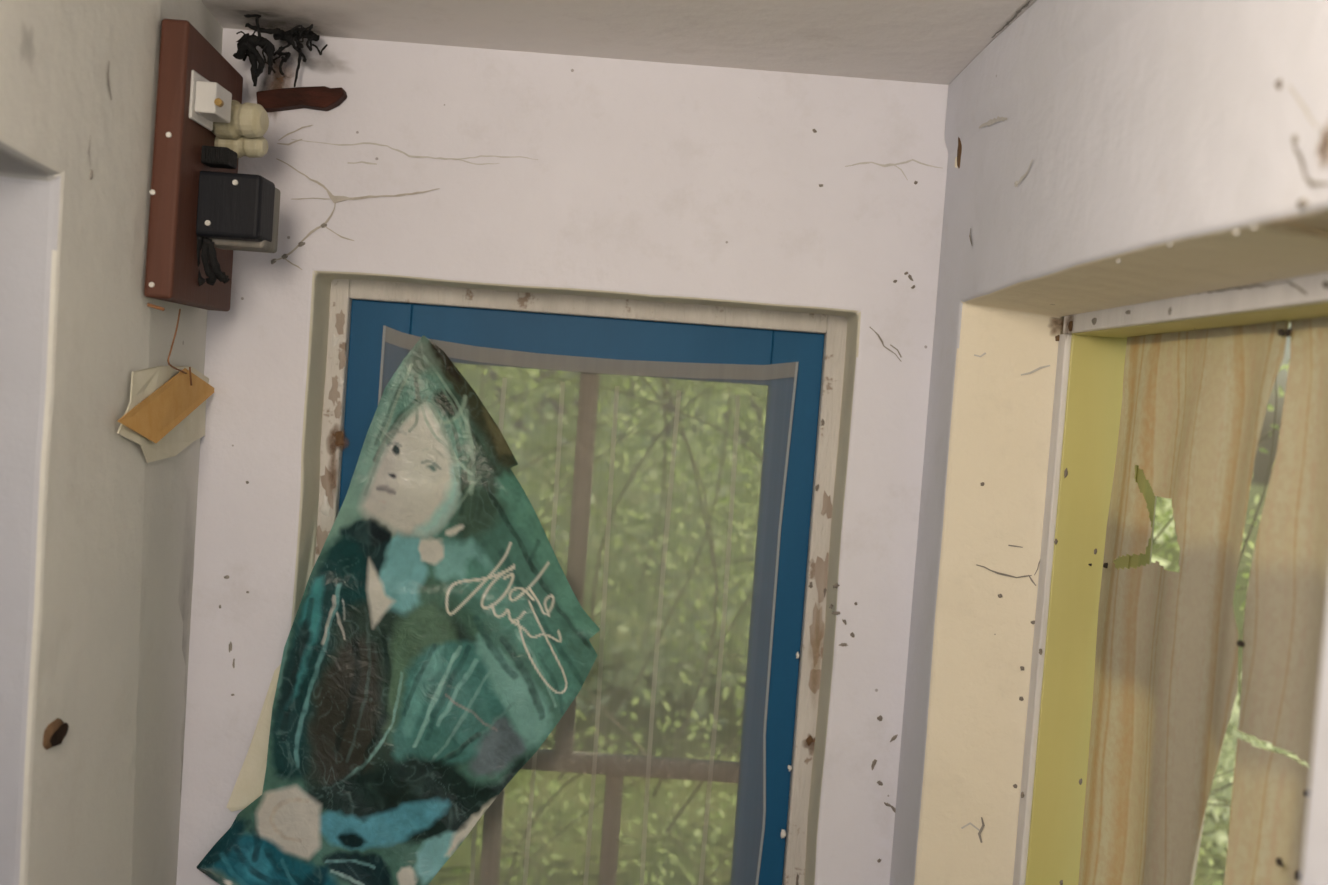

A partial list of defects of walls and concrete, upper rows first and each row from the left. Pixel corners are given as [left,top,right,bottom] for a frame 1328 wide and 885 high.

crack [291,139,538,165]
crack [845,159,941,179]
peeling [815,484,833,519]
peeling [796,552,855,694]
spalling [50,722,69,747]